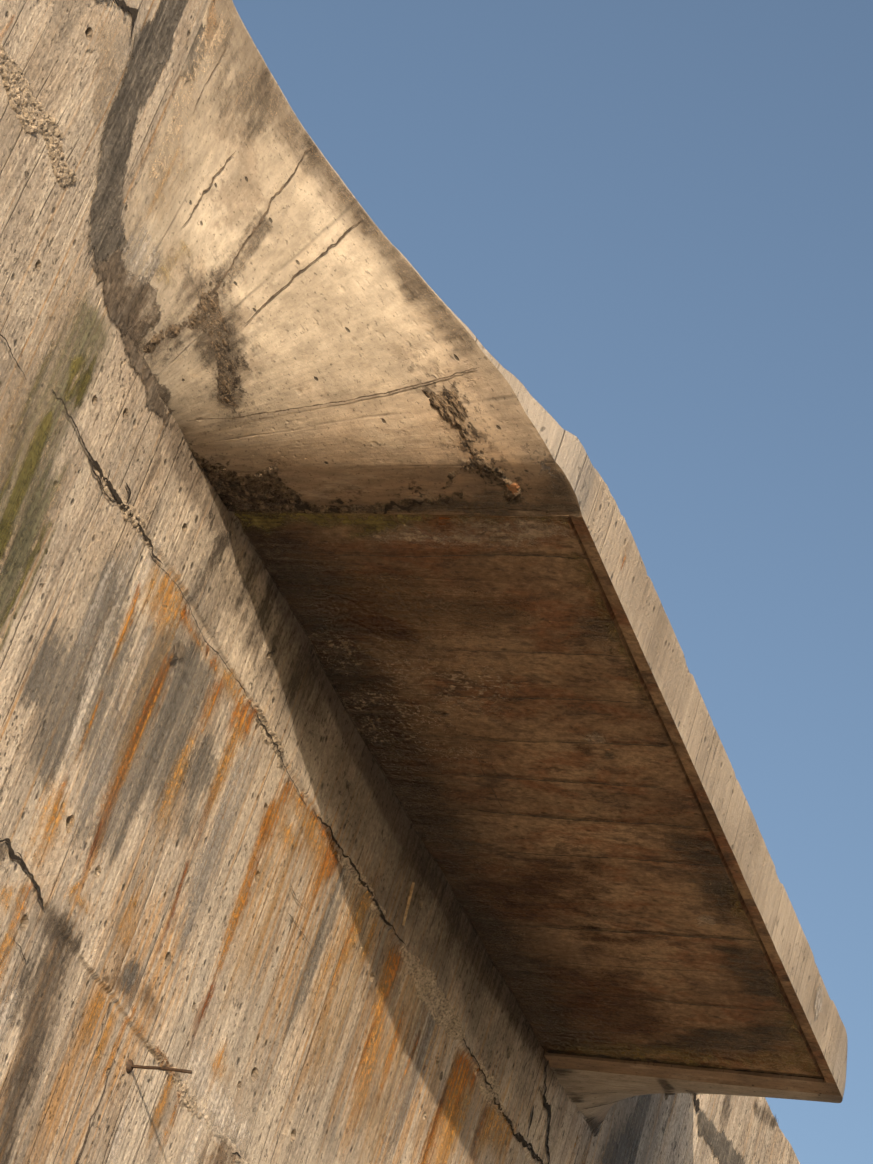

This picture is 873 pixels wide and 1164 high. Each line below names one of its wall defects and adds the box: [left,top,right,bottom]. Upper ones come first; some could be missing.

leakage [137,216,271,409]
leakage [0,464,66,650]
crack [0,838,44,911]
corrosion [89,656,172,860]
corrosion [115,569,256,811]
crack [52,390,405,944]
corrosion [195,778,341,1033]
leakage [193,530,818,1075]
crack [75,1061,131,1164]
leakage [353,946,467,1160]
corrosion [422,1051,479,1164]
crack [463,1039,551,1164]